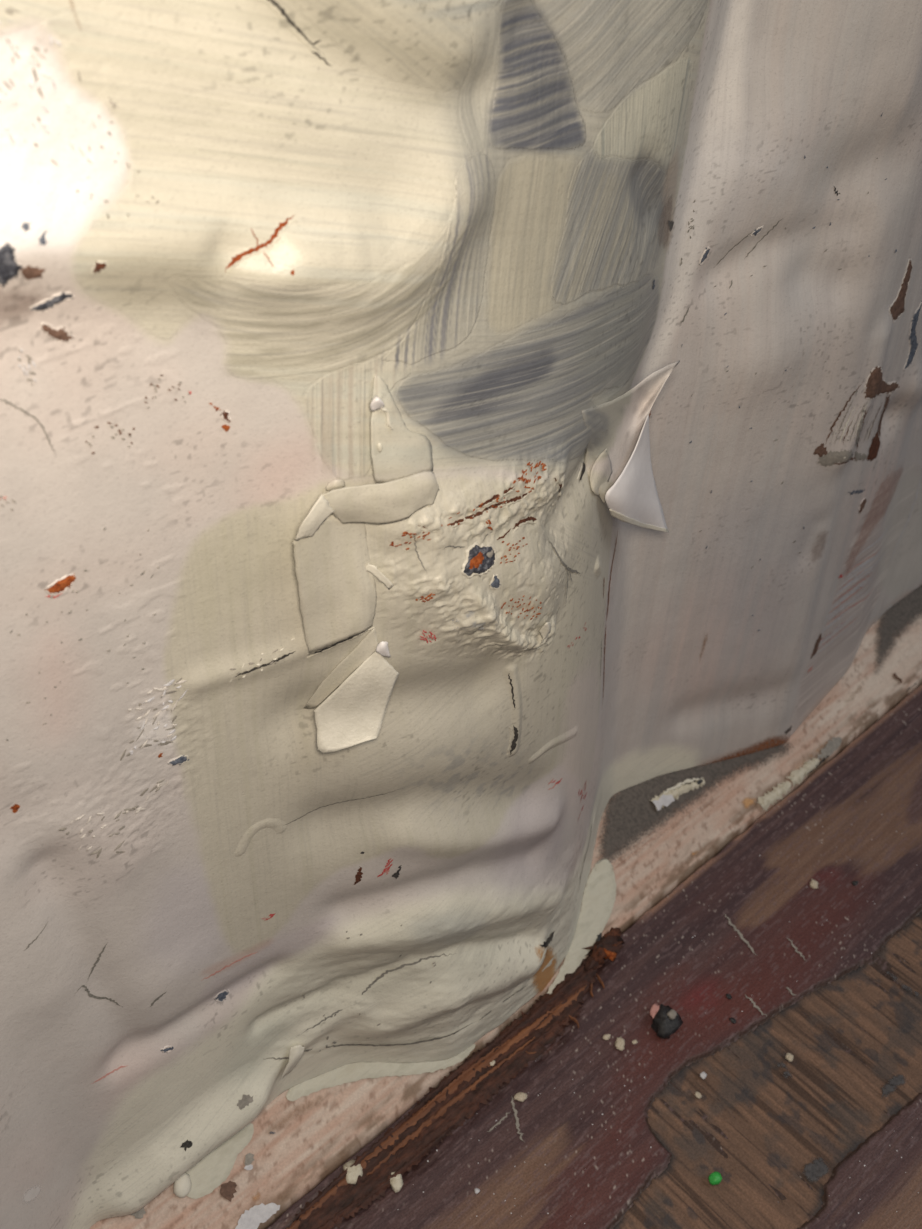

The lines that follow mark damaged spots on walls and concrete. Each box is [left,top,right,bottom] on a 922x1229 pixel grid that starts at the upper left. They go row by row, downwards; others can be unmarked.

crack [261,0,331,66]
peeling [0,242,45,287]
peeling [814,249,922,467]
crack [507,675,518,755]